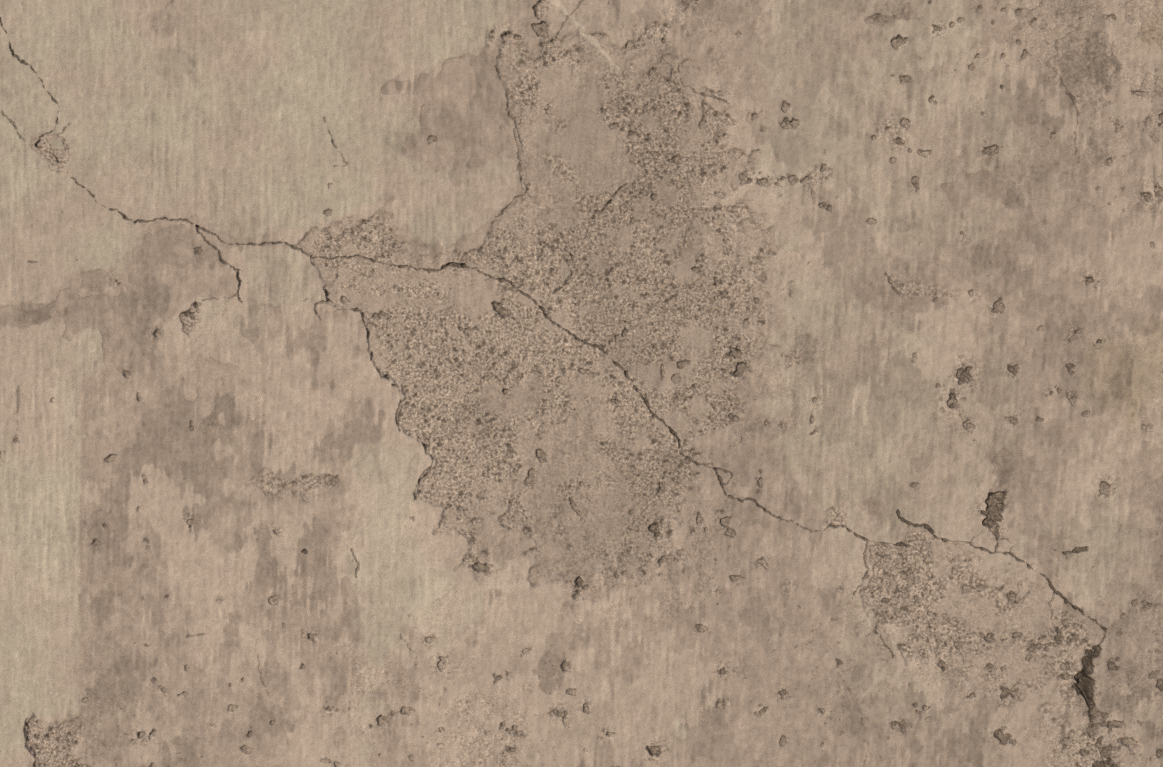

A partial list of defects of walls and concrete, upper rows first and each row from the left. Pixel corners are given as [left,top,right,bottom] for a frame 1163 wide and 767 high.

crack [546,0,612,47]
crack [1059,75,1080,157]
crack [0,16,912,600]
spalling [292,0,833,612]
crack [257,654,272,700]
spalling [754,689,788,719]
crack [880,635,895,659]
crack [896,509,1109,755]
spalling [853,448,1163,767]